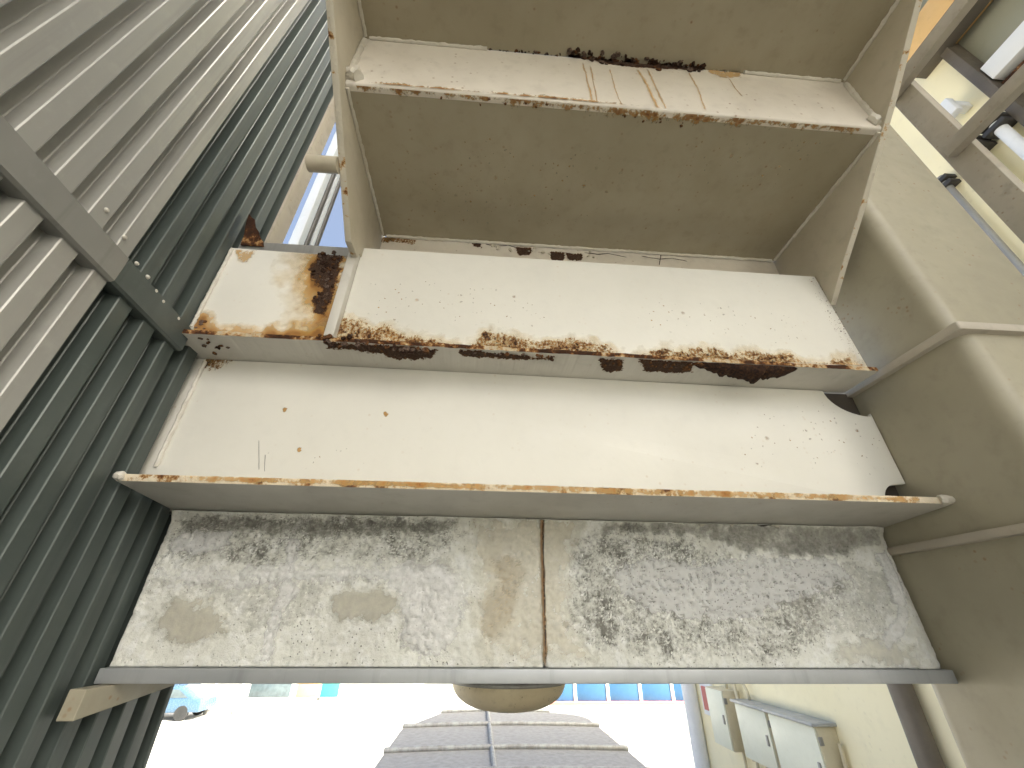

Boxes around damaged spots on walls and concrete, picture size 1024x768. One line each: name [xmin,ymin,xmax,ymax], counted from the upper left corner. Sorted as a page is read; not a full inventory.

rust [357,47,860,144]
rust [191,250,447,371]
rust [458,331,624,373]
rust [638,347,863,373]
rust [190,476,920,502]
water stain [164,519,462,661]
water stain [485,535,521,636]
crack [540,520,548,663]
water stain [616,524,875,622]
water stain [876,552,908,648]